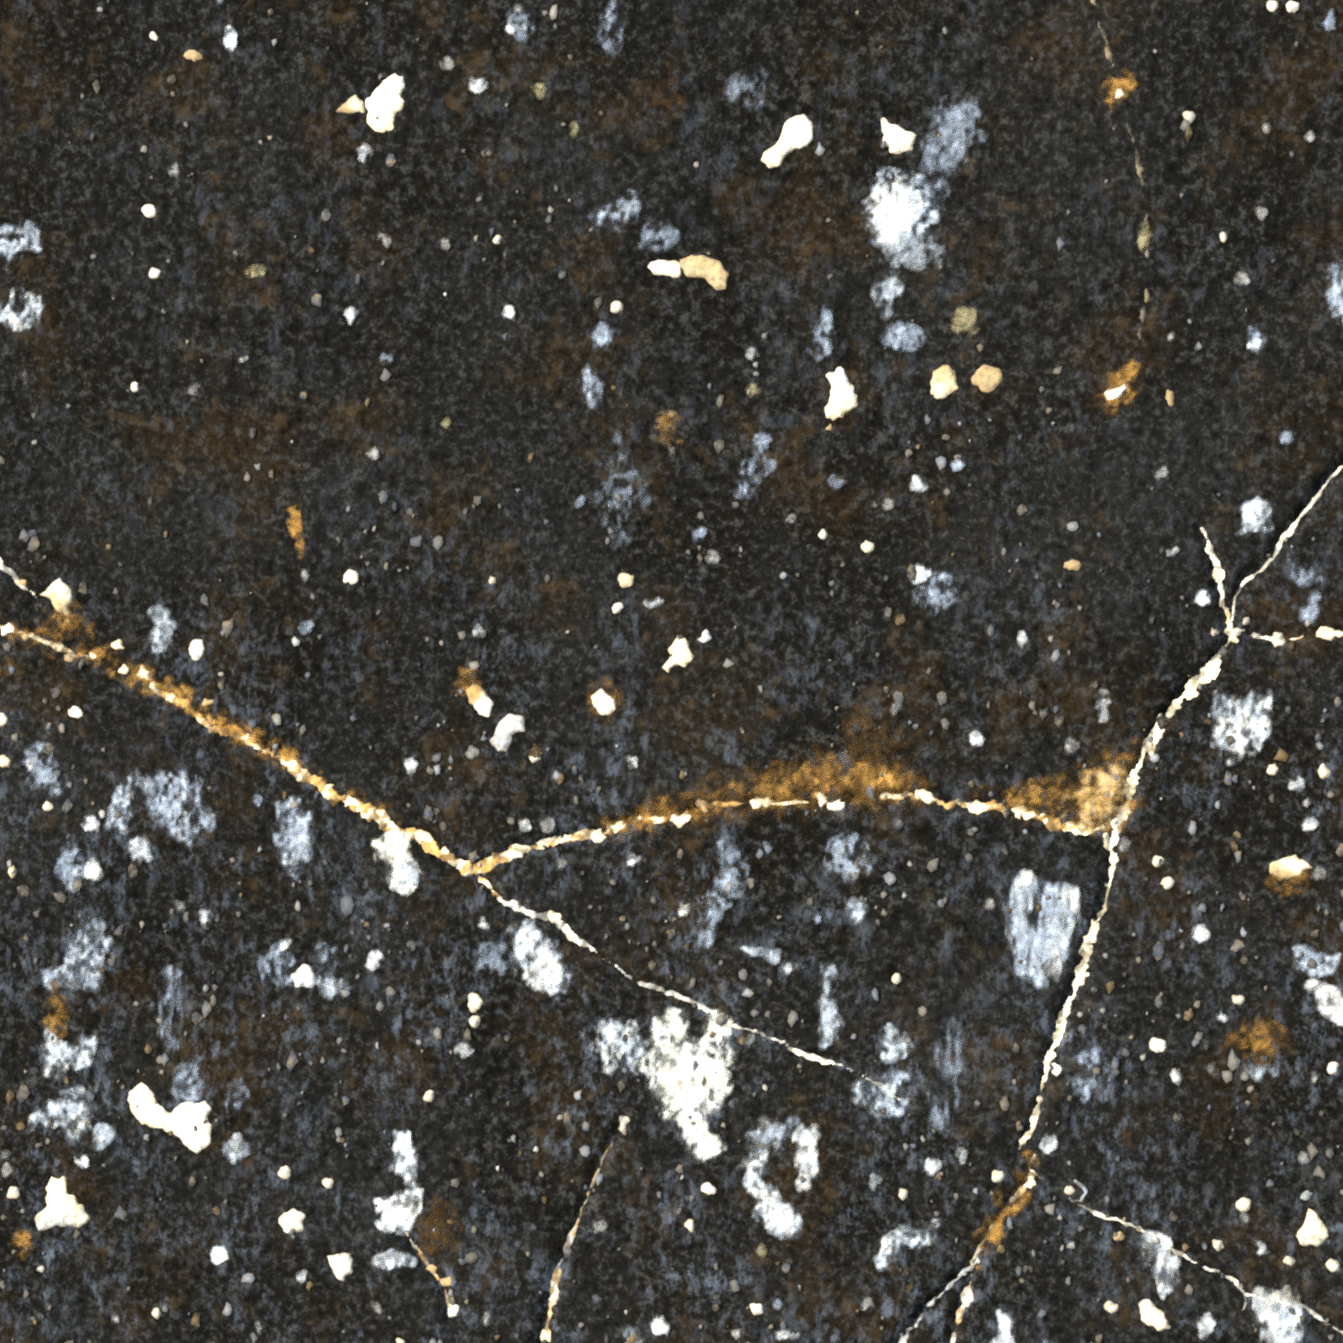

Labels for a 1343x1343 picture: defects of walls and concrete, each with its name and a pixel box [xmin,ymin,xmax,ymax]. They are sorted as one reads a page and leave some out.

crack [1091,0,1114,66]
crack [1126,124,1150,339]
rust [999,741,1138,832]
crack [0,465,1343,1343]